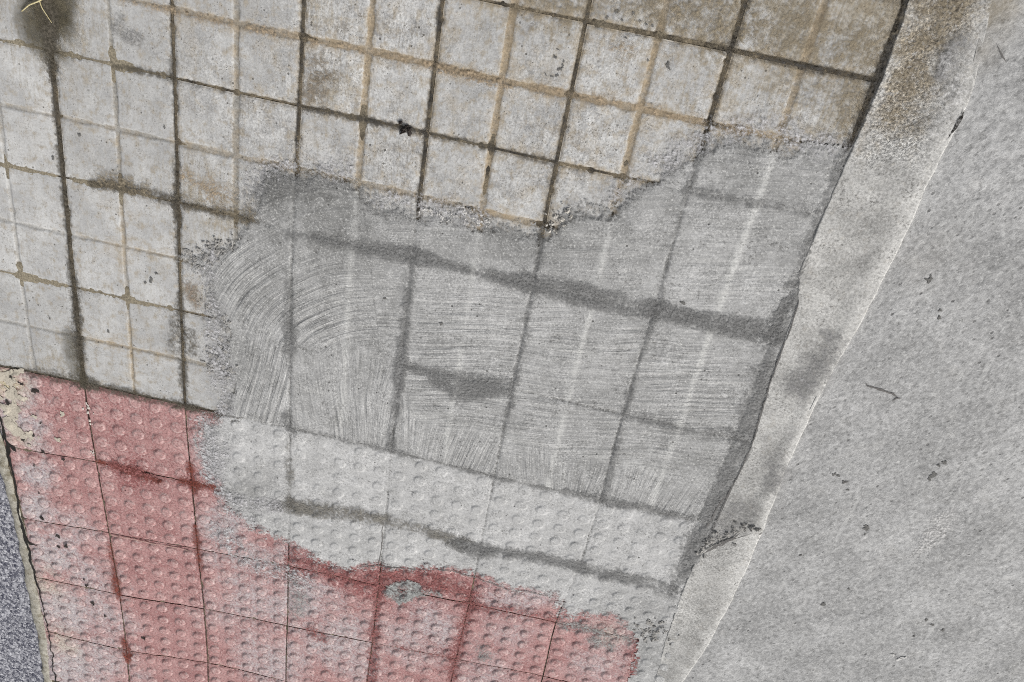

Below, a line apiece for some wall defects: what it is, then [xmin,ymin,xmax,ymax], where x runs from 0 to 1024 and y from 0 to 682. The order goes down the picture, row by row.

leakage [35,0,64,86]
leakage [68,280,87,371]